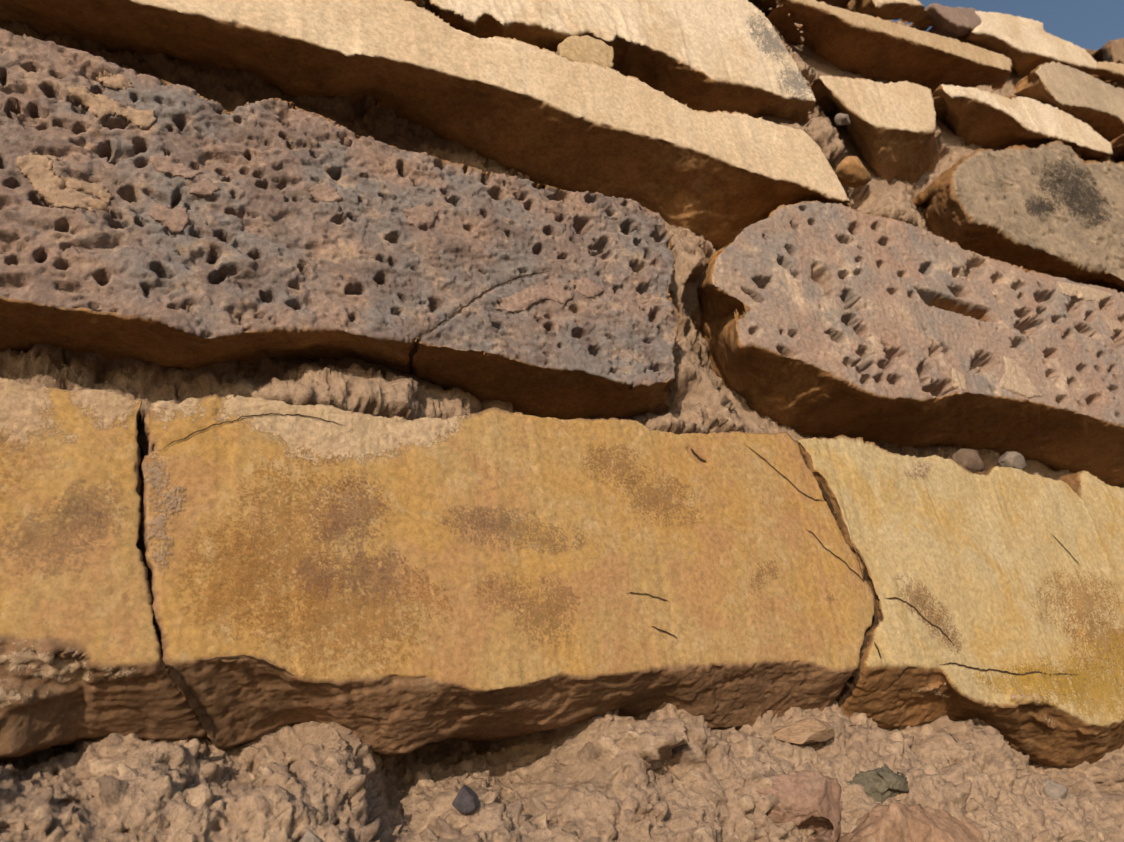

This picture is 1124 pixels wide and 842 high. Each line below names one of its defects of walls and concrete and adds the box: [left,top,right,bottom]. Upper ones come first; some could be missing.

crack [407,271,551,375]
crack [136,413,346,737]
crack [749,447,1077,707]